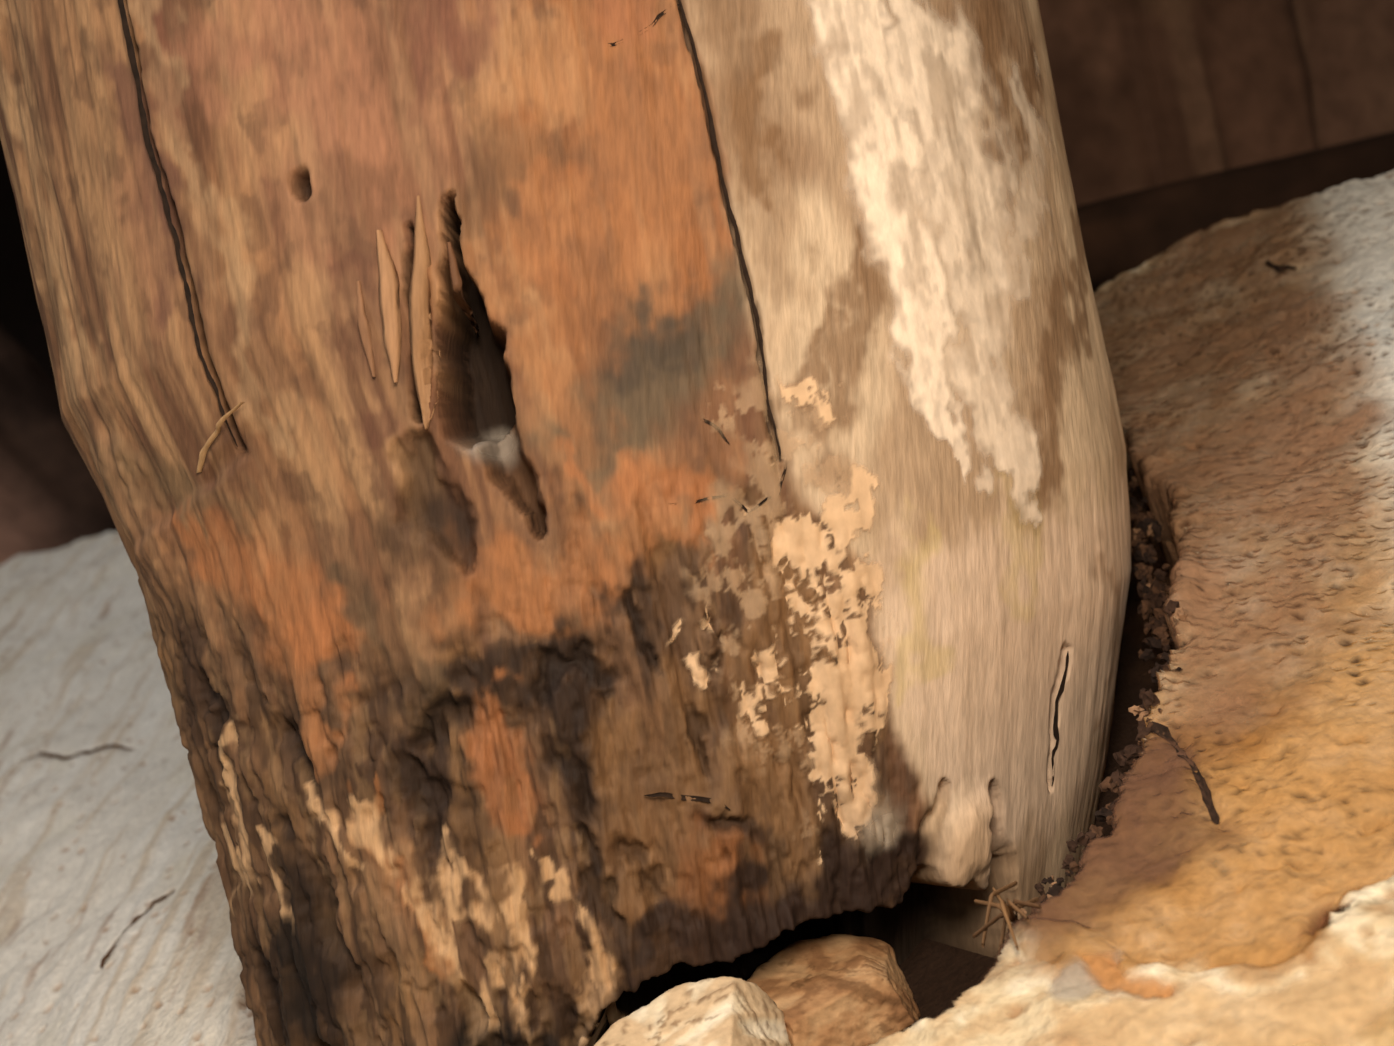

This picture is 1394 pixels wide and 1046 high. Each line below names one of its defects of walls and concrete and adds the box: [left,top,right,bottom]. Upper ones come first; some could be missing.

crack [118,0,238,447]
crack [608,0,787,512]
peeling [779,377,836,425]
peeling [685,653,708,689]
peeling [740,464,892,839]
crack [18,744,134,762]
peeling [579,1002,624,1046]